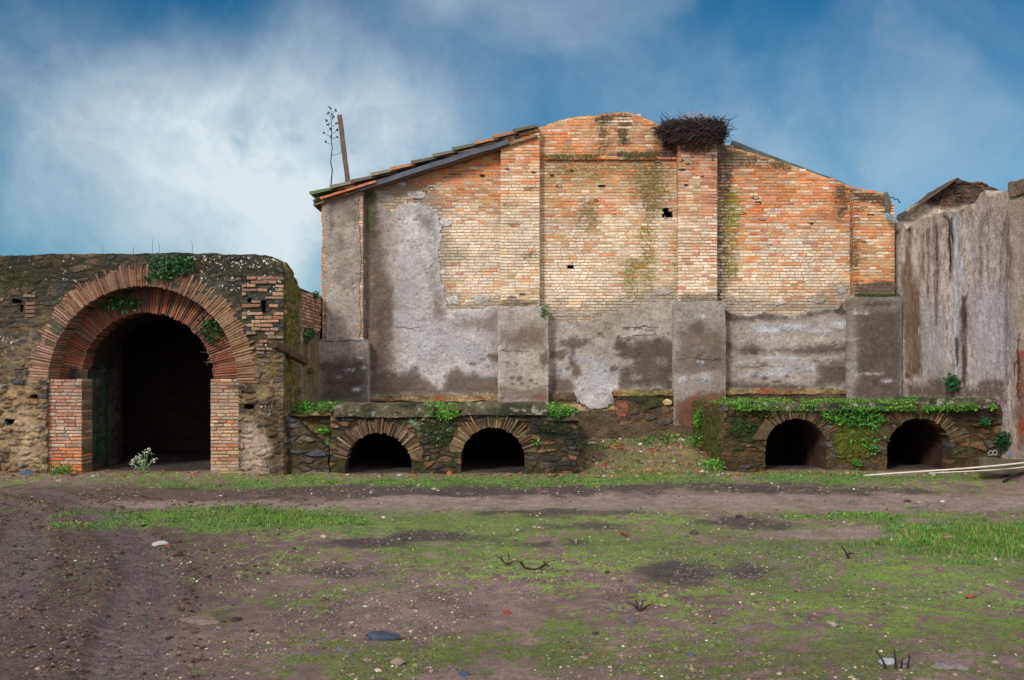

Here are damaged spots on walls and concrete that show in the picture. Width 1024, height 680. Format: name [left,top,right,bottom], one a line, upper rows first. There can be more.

spalling [376,143,525,311]
water stain [303,185,1011,403]
water stain [681,142,790,262]